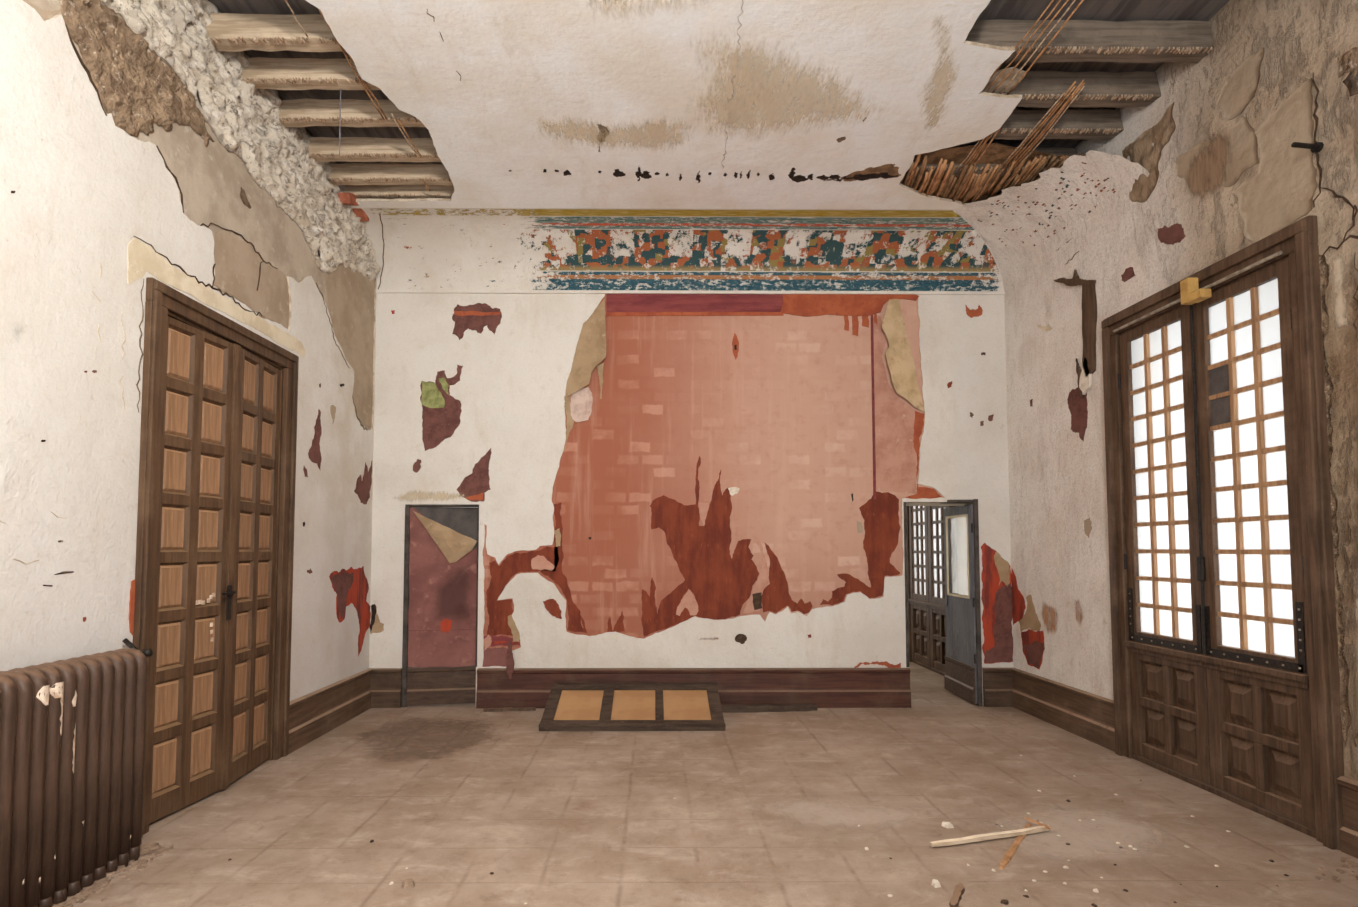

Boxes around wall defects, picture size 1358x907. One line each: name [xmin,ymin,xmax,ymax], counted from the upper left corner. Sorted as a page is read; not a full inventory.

peeling [23,0,375,430]
peeling [331,78,1318,318]
crack [1312,73,1358,381]
peeling [452,303,502,340]
peeling [413,365,463,473]
peeling [1067,387,1088,441]
peeling [457,448,491,502]
peeling [329,566,384,656]
peeling [543,599,562,619]
peeling [981,543,1045,669]